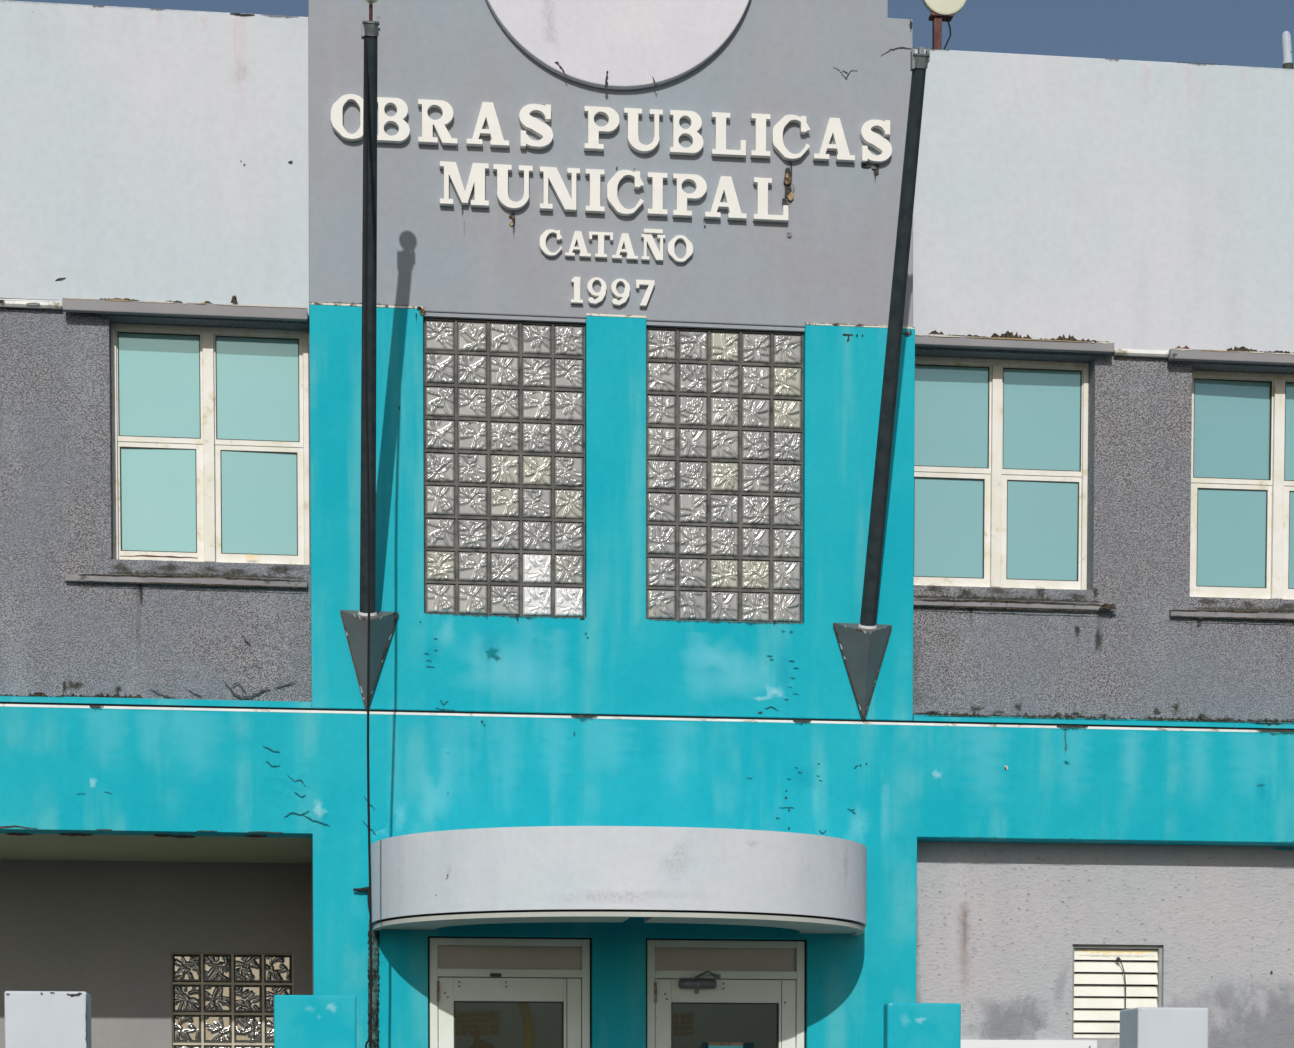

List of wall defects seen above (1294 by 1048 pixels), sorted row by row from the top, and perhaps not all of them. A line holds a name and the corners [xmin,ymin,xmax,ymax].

water stain [913,704,1294,764]
water stain [1208,997,1294,1048]